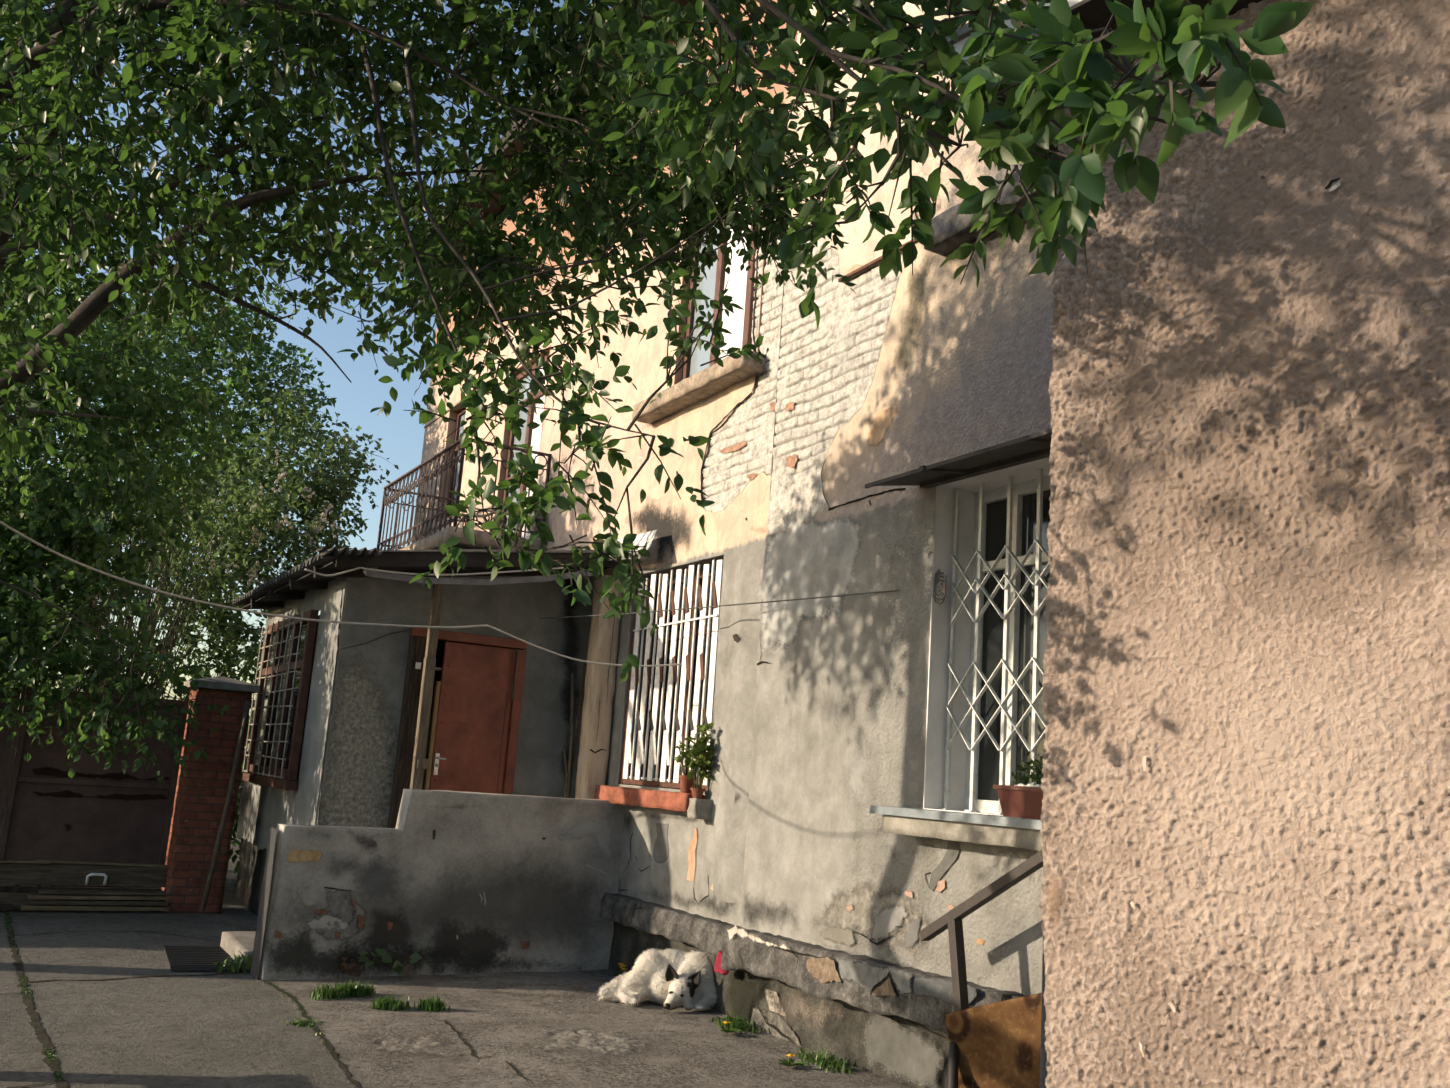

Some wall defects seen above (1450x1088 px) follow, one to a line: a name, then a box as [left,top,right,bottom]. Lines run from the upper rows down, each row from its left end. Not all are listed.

peeling [700,215,903,535]
flaking render [315,887,366,940]
leakage [238,781,585,979]
flaking render [815,883,929,956]
peeling [925,840,960,910]
spalling [806,957,841,983]
spalling [870,975,896,996]